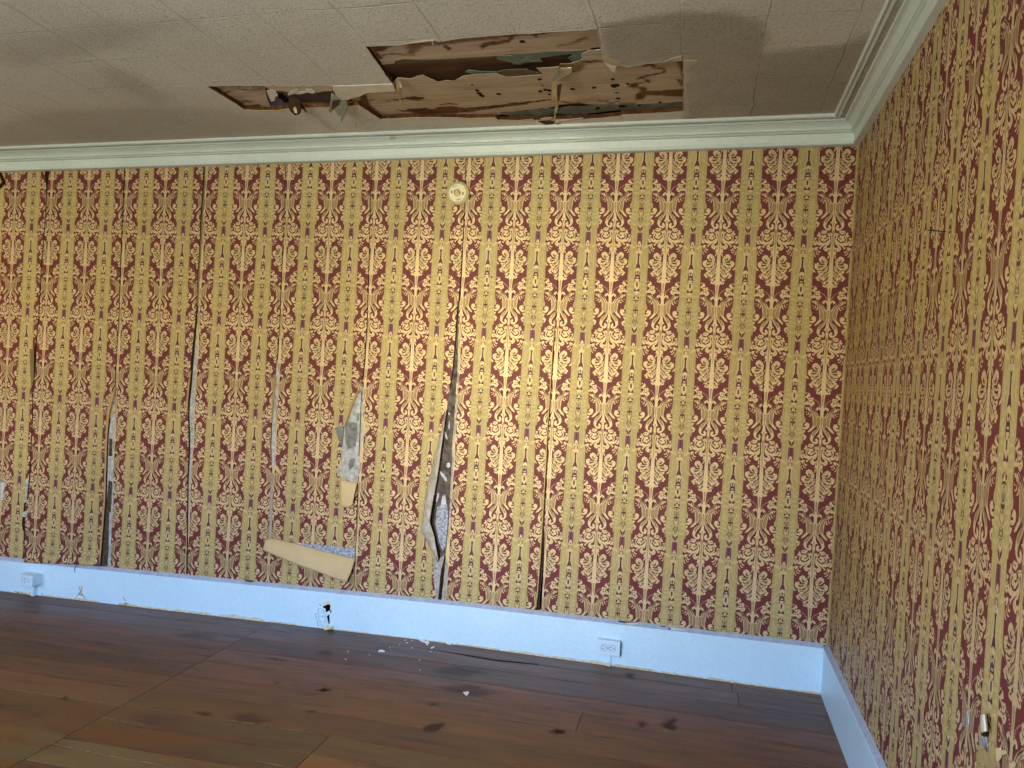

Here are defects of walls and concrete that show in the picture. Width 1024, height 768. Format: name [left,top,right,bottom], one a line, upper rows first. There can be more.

peeling [263,266,369,586]
peeling [420,203,465,600]
peeling [41,586,100,603]
peeling [118,597,295,625]
peeling [315,601,821,695]